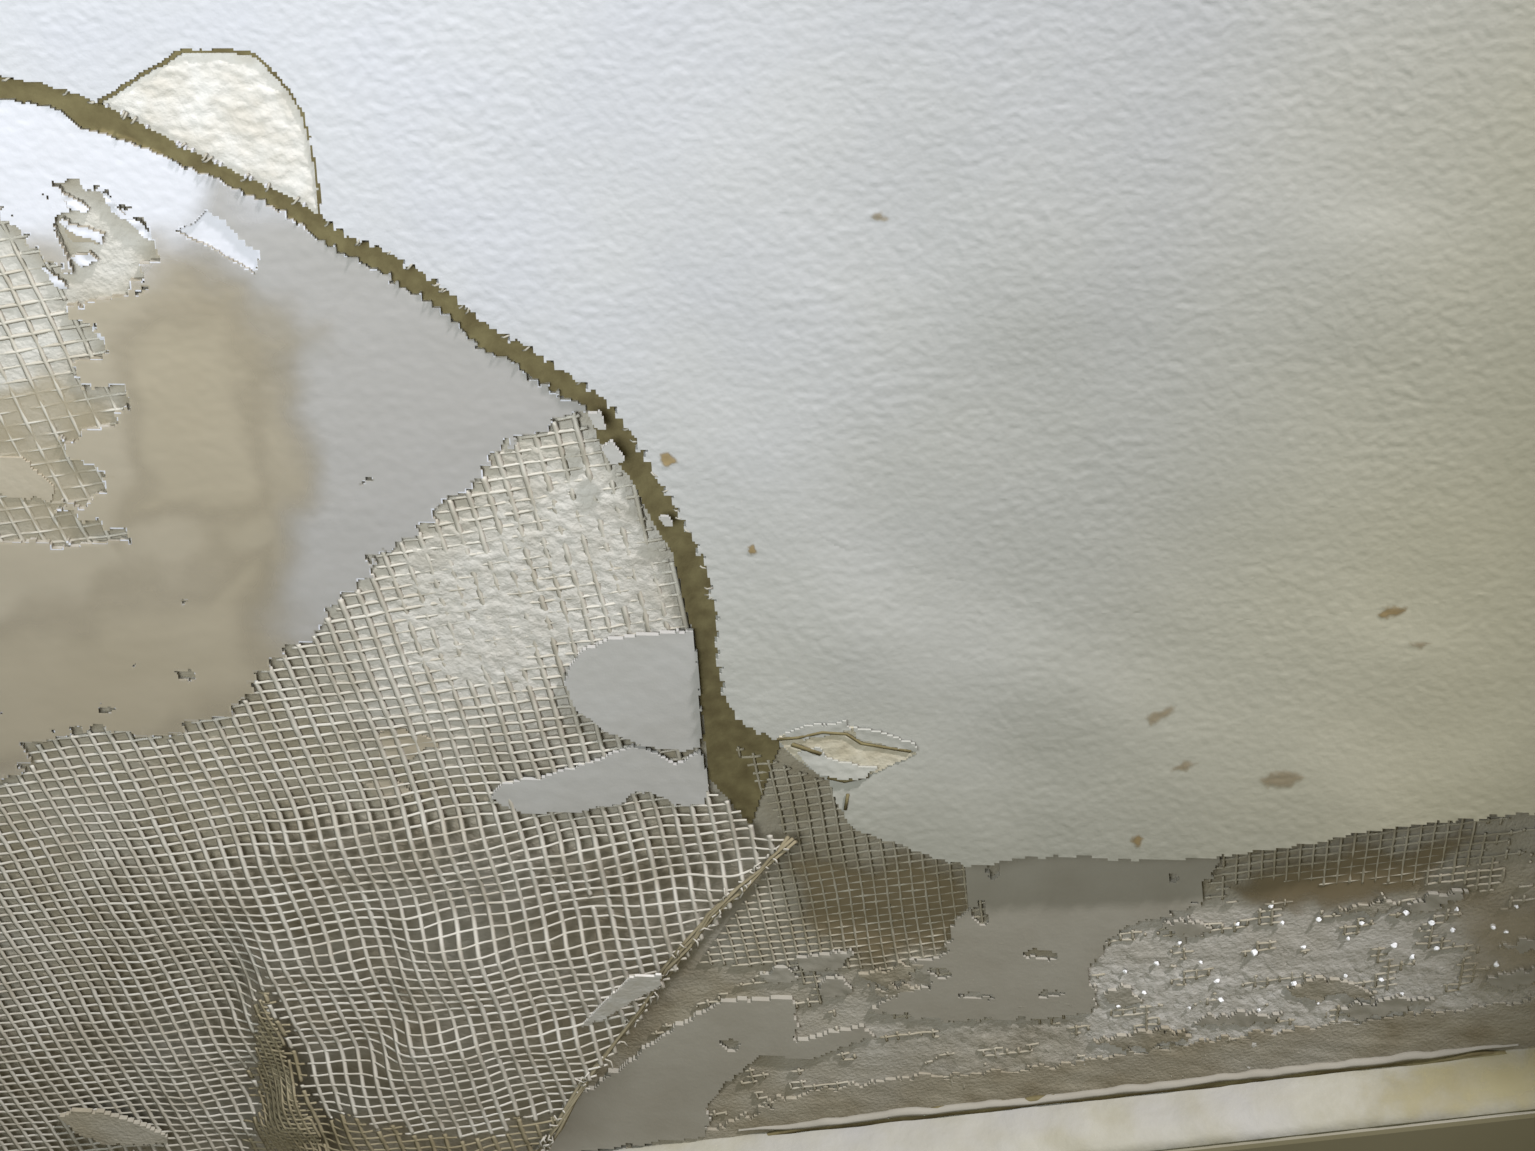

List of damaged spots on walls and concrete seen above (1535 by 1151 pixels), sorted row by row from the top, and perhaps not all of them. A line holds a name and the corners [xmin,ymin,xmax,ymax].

flaking render [0,53,586,450]
flaking render [0,456,132,550]
crack [0,48,779,824]
flaking render [415,418,553,528]
flaking render [231,542,396,715]
flaking render [366,779,413,804]
flaking render [373,728,438,760]
peeling [564,628,702,752]
peeling [777,720,917,810]
flaking render [533,855,1535,1151]
peeling [59,1107,168,1146]